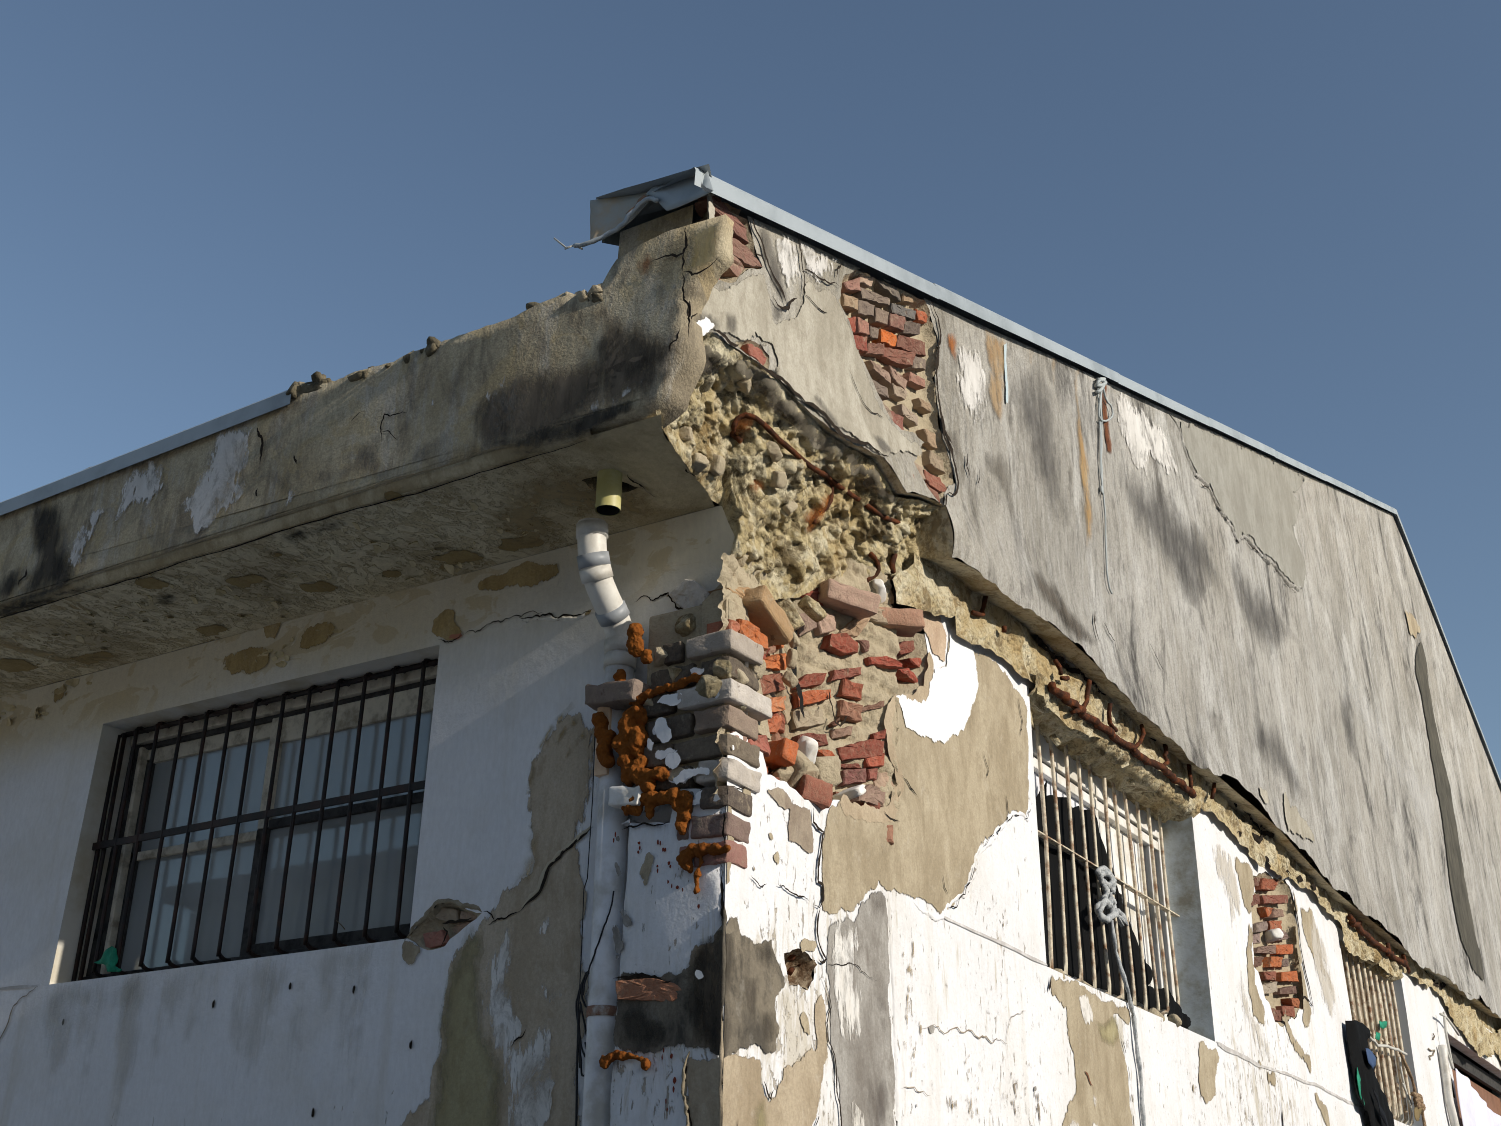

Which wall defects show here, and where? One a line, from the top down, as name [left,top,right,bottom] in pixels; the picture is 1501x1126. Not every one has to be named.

spalling [286,336,443,400]
leakage [476,310,667,453]
leakage [0,460,163,616]
leakage [184,428,252,533]
peeling [352,497,559,591]
flaking render [401,196,1033,1126]
crack [484,822,668,925]
crack [0,986,38,1039]
leakage [613,905,785,1058]
peeling [1049,968,1182,1126]
flaking render [1213,831,1336,1087]
peeling [1315,1093,1330,1126]